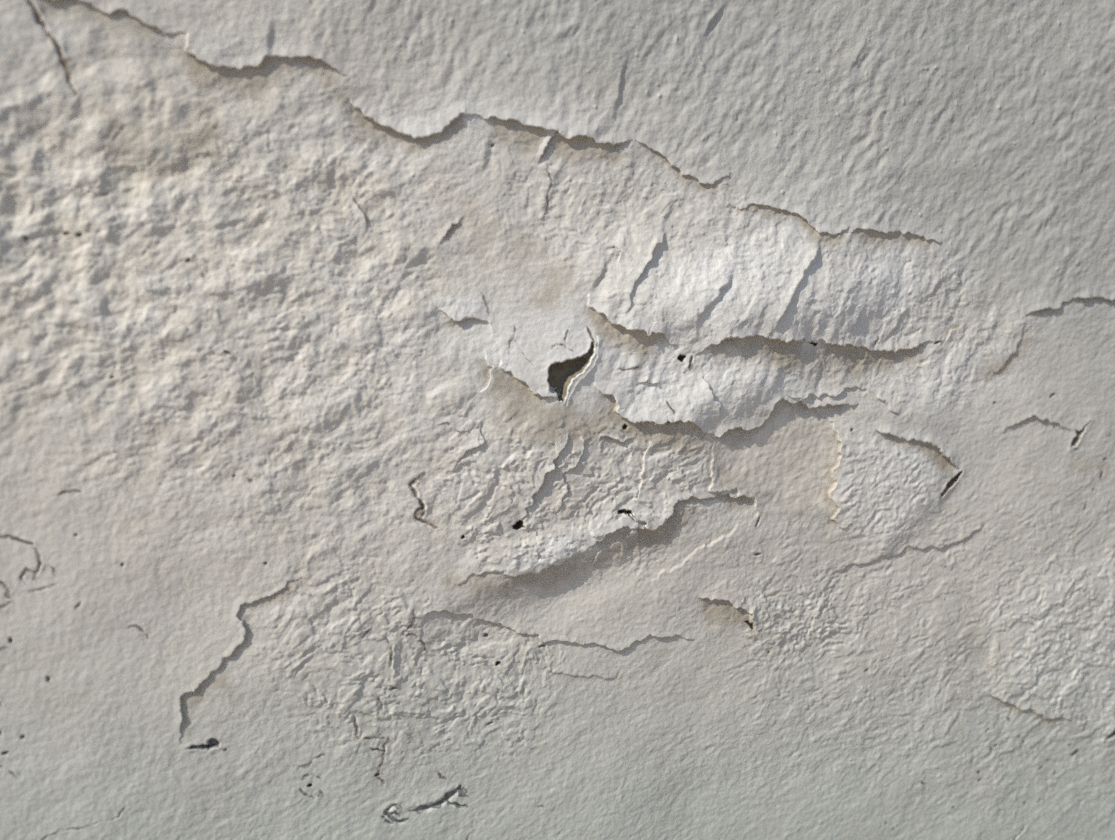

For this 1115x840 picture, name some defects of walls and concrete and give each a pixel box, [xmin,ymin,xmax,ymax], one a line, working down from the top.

crack [27,0,76,95]
peeling [79,0,349,85]
peeling [346,89,731,188]
peeling [435,215,461,243]
peeling [728,194,947,244]
peeling [1024,289,1115,315]
peeling [480,230,966,547]
crack [0,535,54,609]
peeling [171,570,304,745]
crack [363,614,426,665]
peeling [699,592,761,632]
crack [354,720,468,824]